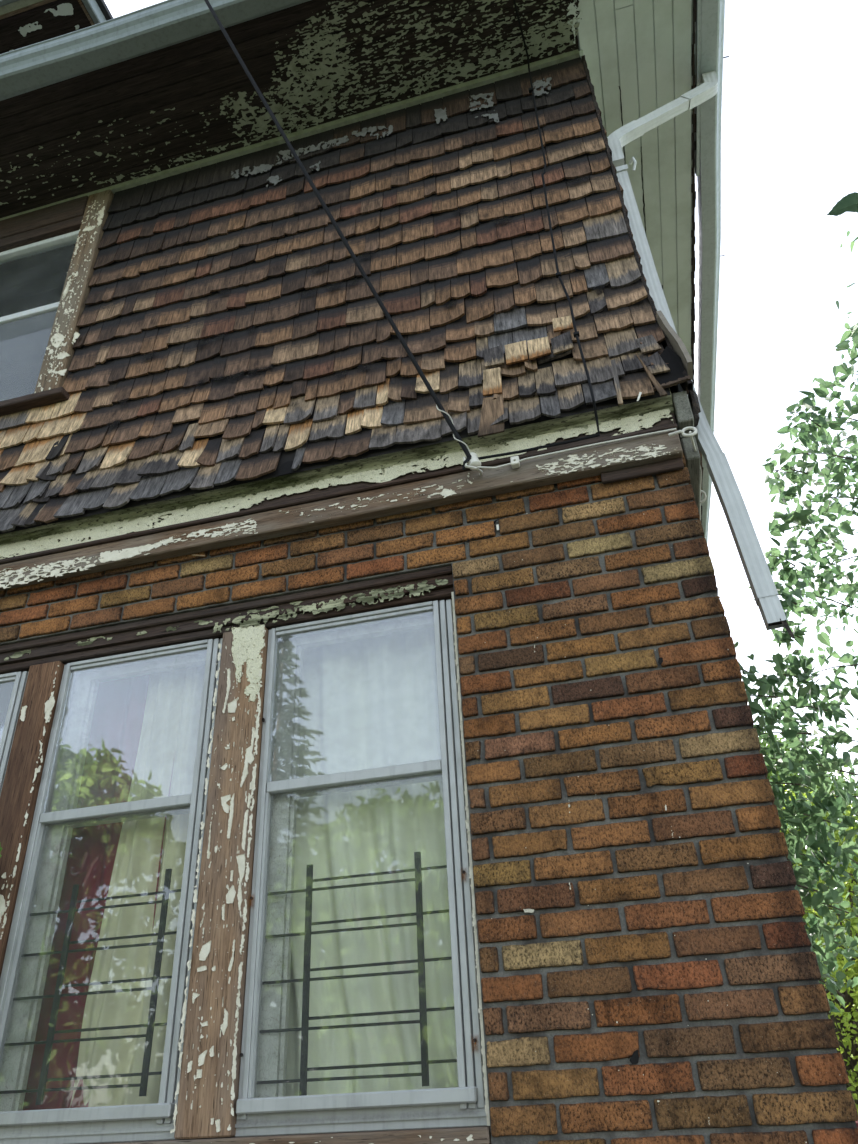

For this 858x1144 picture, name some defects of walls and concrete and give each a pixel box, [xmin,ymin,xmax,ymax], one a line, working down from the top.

peeling [0,0,582,205]
peeling [34,200,105,393]
peeling [0,409,679,589]
peeling [4,649,31,661]
peeling [33,696,55,782]
peeling [76,636,112,646]
peeling [0,843,21,928]
peeling [170,579,448,1133]